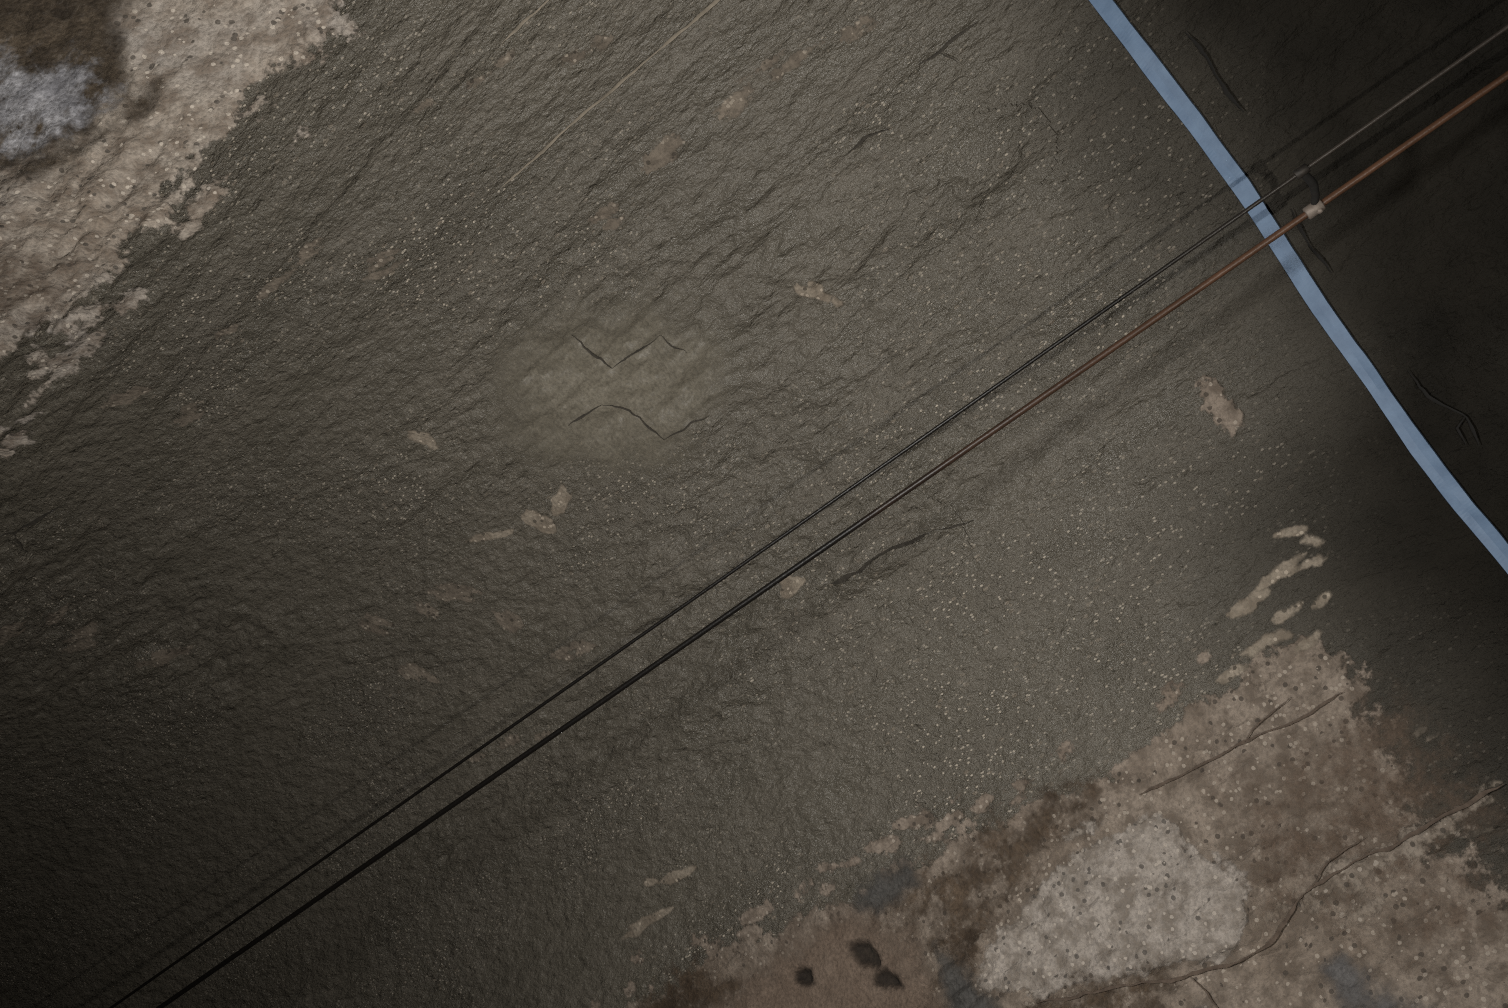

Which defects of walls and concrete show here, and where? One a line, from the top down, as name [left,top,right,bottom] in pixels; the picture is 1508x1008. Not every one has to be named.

damp [0,0,161,176]
peeling [0,0,365,459]
peeling [408,430,438,450]
peeling [414,583,481,619]
peeling [622,525,1508,1008]